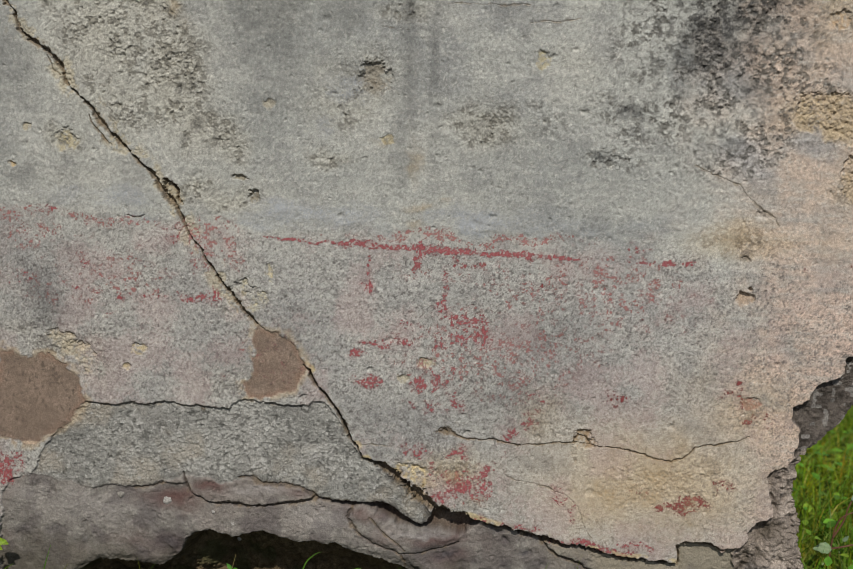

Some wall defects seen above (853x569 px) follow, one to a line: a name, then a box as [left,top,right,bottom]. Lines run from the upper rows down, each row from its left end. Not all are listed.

damp [679,0,784,71]
crack [4,0,258,325]
peeling [163,180,245,270]
peeling [76,251,167,308]
peeling [263,227,693,413]
crack [87,401,232,409]
spalling [0,399,494,524]
crack [135,366,750,569]
spalling [571,429,599,453]
peeling [655,495,710,516]
spalling [721,381,768,425]
spalling [792,357,853,458]